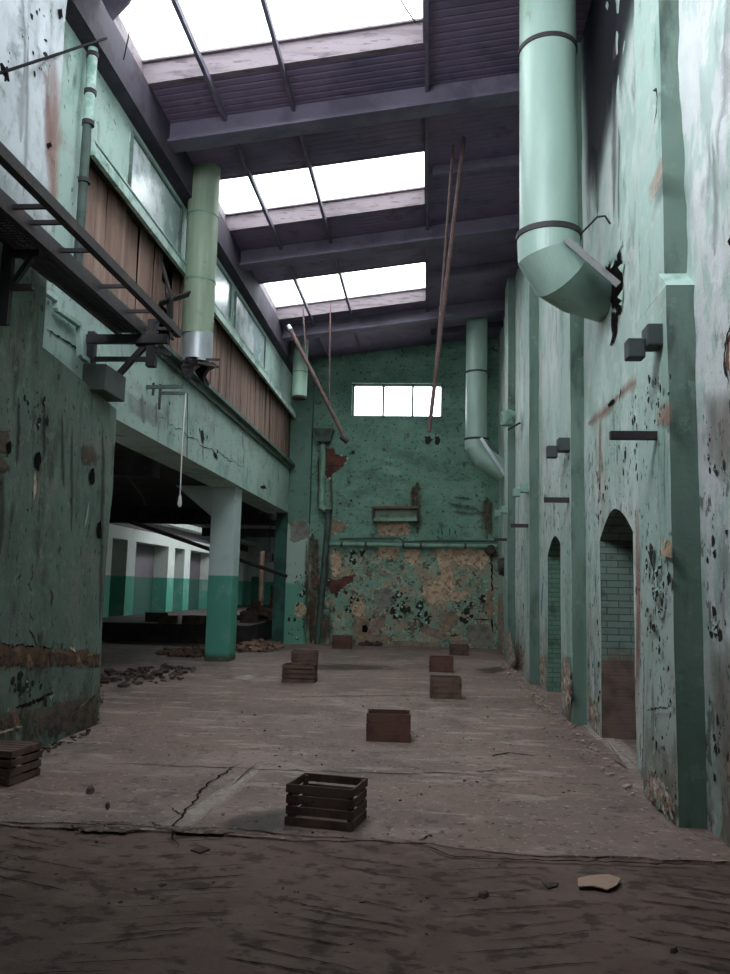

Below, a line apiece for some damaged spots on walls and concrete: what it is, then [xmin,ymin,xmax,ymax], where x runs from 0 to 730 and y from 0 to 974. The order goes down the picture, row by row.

flaking render [0,430,11,483]
flaking render [325,447,349,480]
flaking render [377,522,421,566]
flaking render [326,548,524,671]
flaking render [0,642,104,738]
crack [333,752,534,776]
crack [2,762,309,848]